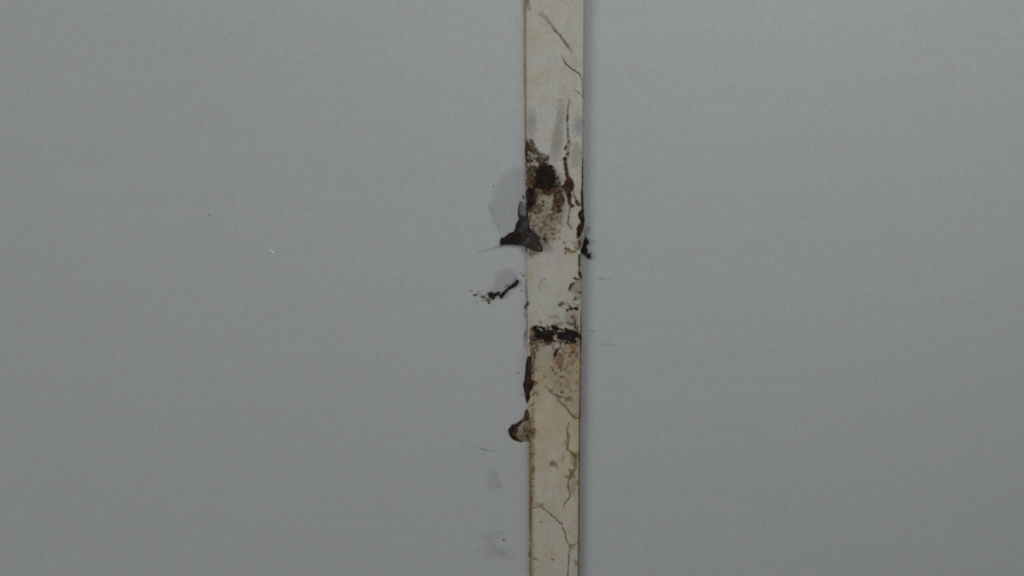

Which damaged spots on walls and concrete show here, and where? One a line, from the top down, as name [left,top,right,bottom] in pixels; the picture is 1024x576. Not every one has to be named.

peeling [500,201,543,255]
crack [533,394,579,576]